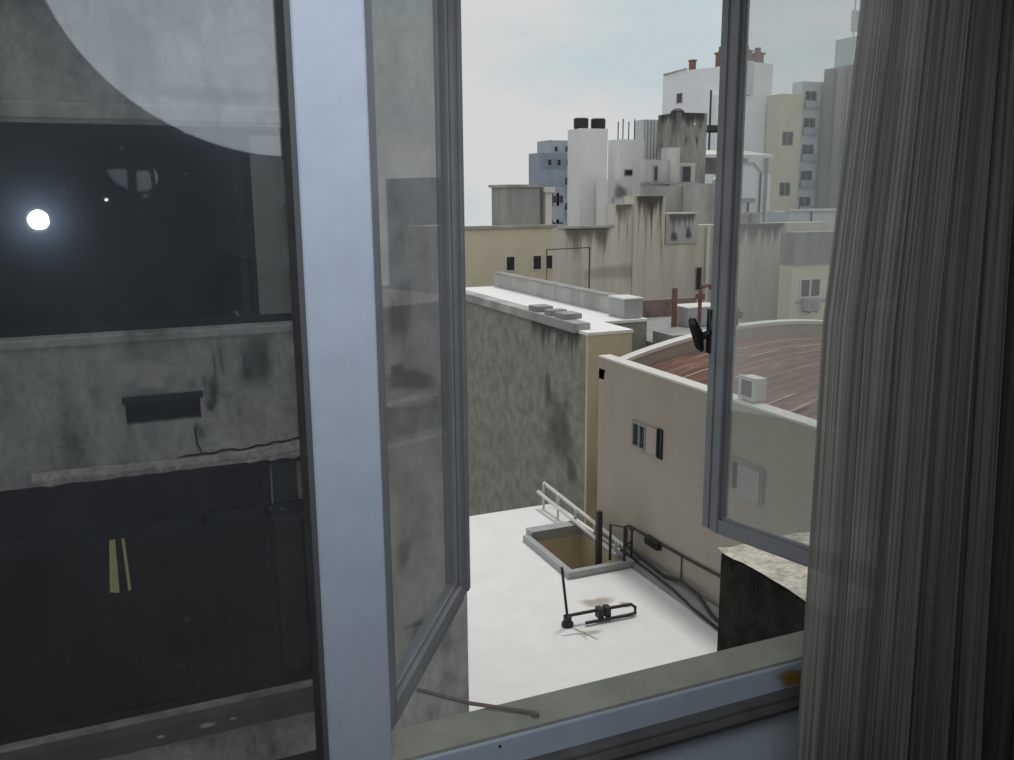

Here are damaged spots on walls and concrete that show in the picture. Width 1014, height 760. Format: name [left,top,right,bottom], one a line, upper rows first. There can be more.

damp [616,187,695,240]
damp [740,223,784,236]
crack [177,426,299,458]
corrosion [781,670,801,686]